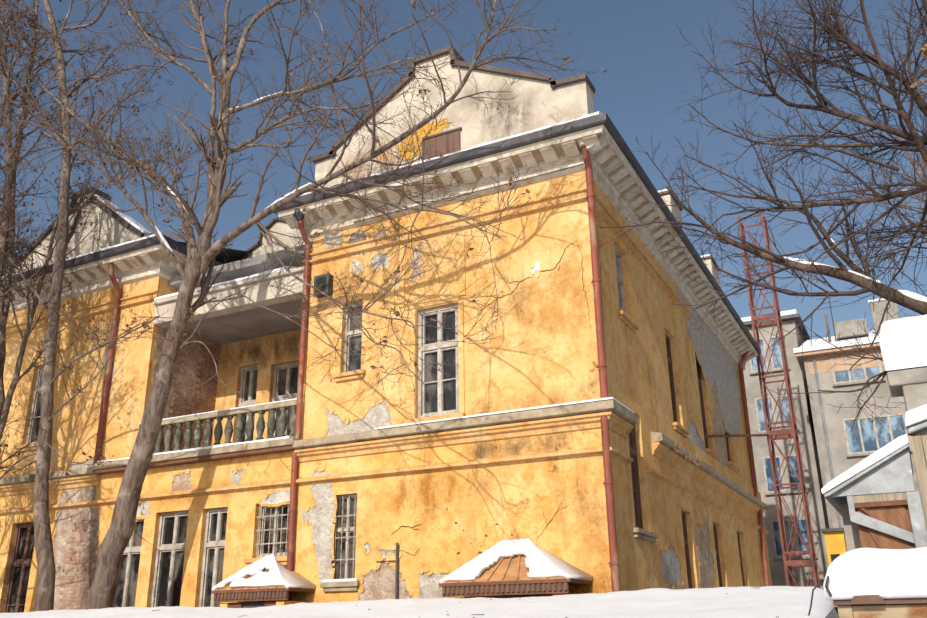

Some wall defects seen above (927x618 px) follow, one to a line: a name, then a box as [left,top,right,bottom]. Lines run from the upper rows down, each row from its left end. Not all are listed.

flaking render [320,225,426,291]
crack [468,240,608,340]
flaking render [672,286,741,469]
flaking render [324,396,397,437]
flaking render [170,468,195,499]
flaking render [52,486,101,610]
flaking render [259,461,337,583]
flaking render [353,542,454,601]
flaking render [660,535,683,589]
flaking render [694,517,715,588]